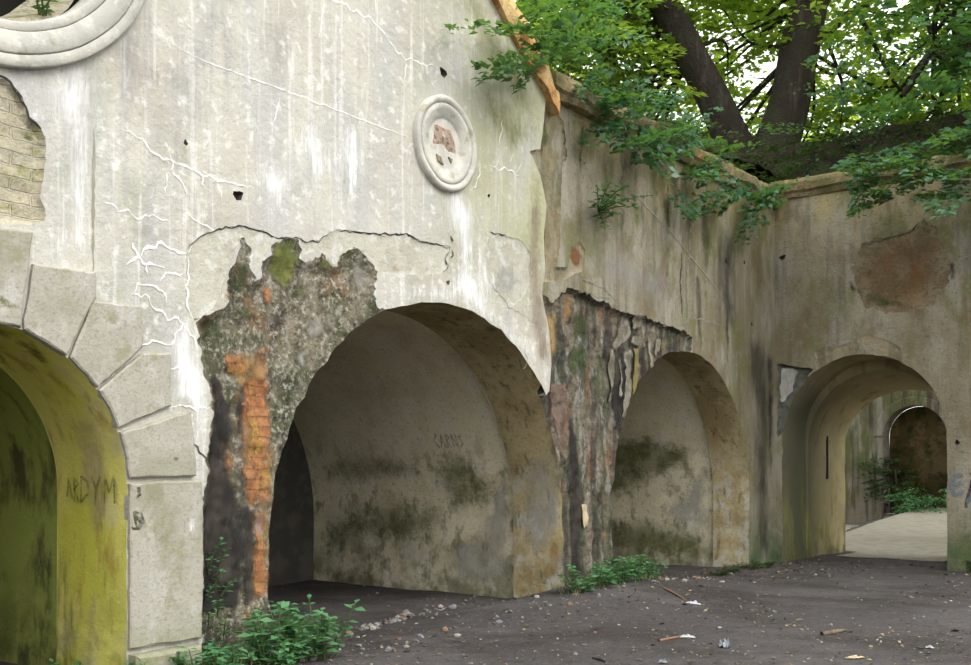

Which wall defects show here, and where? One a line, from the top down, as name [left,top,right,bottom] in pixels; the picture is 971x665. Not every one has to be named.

spalling [0,75,46,225]
crack [104,128,254,373]
flaking render [484,232,531,308]
crack [169,405,211,464]
spalling [186,225,450,665]
spalling [535,110,692,586]
spalling [777,334,902,437]